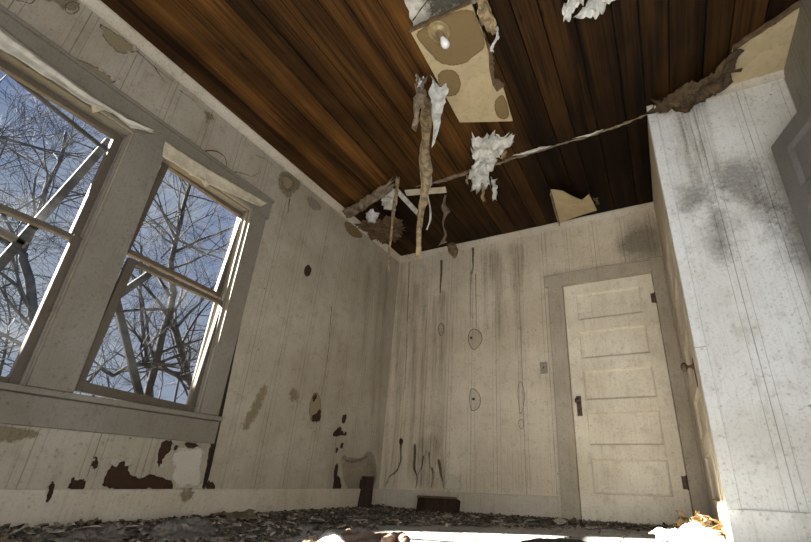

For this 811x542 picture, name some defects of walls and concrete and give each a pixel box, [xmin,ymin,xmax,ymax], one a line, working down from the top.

peeling [99,24,139,55]
leakage [417,0,485,96]
leakage [495,95,509,119]
peeling [309,393,321,423]
spalling [333,414,347,453]
spalling [68,456,99,489]
spalling [102,440,215,489]
spalling [332,464,342,489]